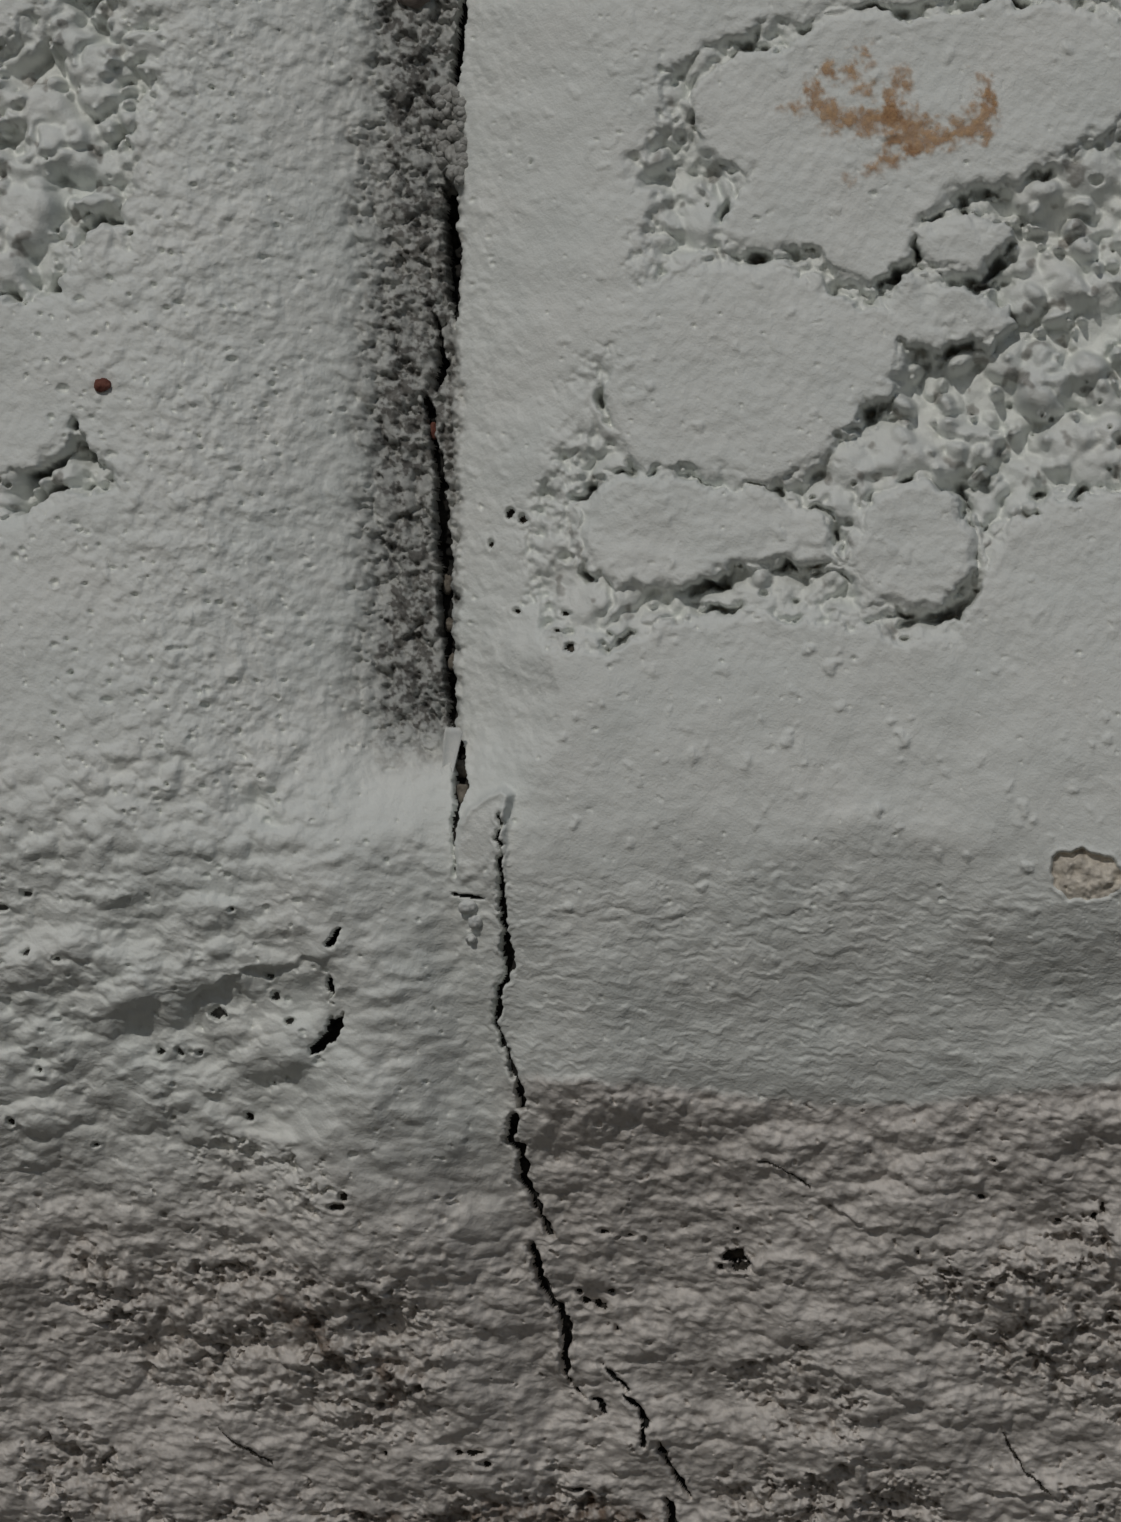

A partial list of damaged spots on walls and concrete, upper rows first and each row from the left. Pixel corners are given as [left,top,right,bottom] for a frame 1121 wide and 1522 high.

crack [454,0,468,84]
spalling [0,0,157,304]
rust [791,48,997,170]
spalling [507,0,1121,654]
spalling [0,423,114,518]
crack [424,194,691,1522]
peeling [1051,848,1121,900]